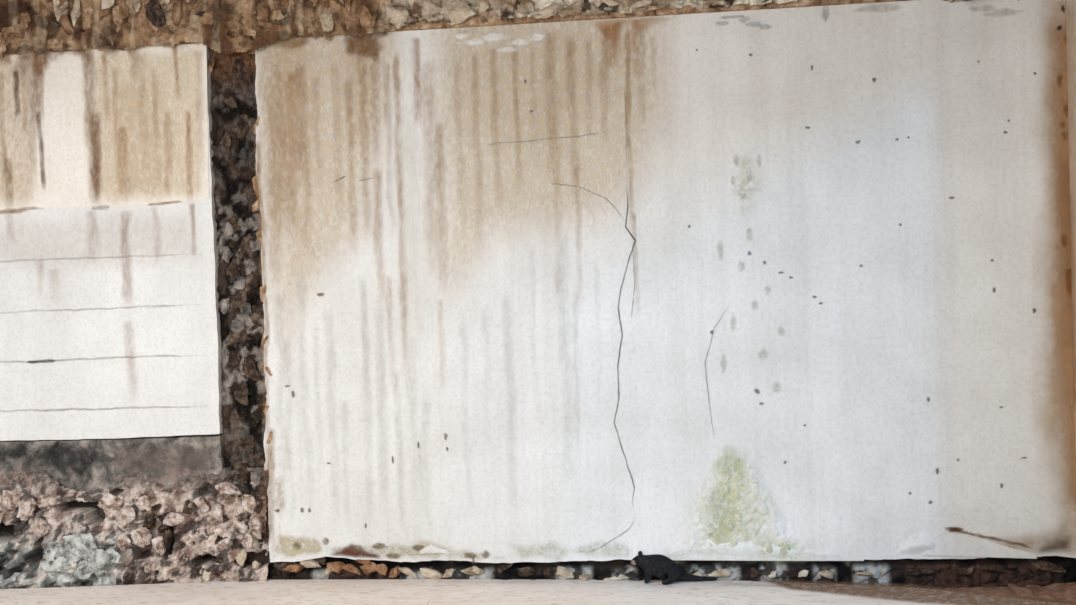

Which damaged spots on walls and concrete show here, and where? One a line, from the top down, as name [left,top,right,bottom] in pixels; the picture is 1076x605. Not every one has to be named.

water stain [22,53,48,85]
water stain [272,32,386,257]
spalling [0,0,810,589]
crack [560,184,636,494]
flaking render [675,449,1076,589]